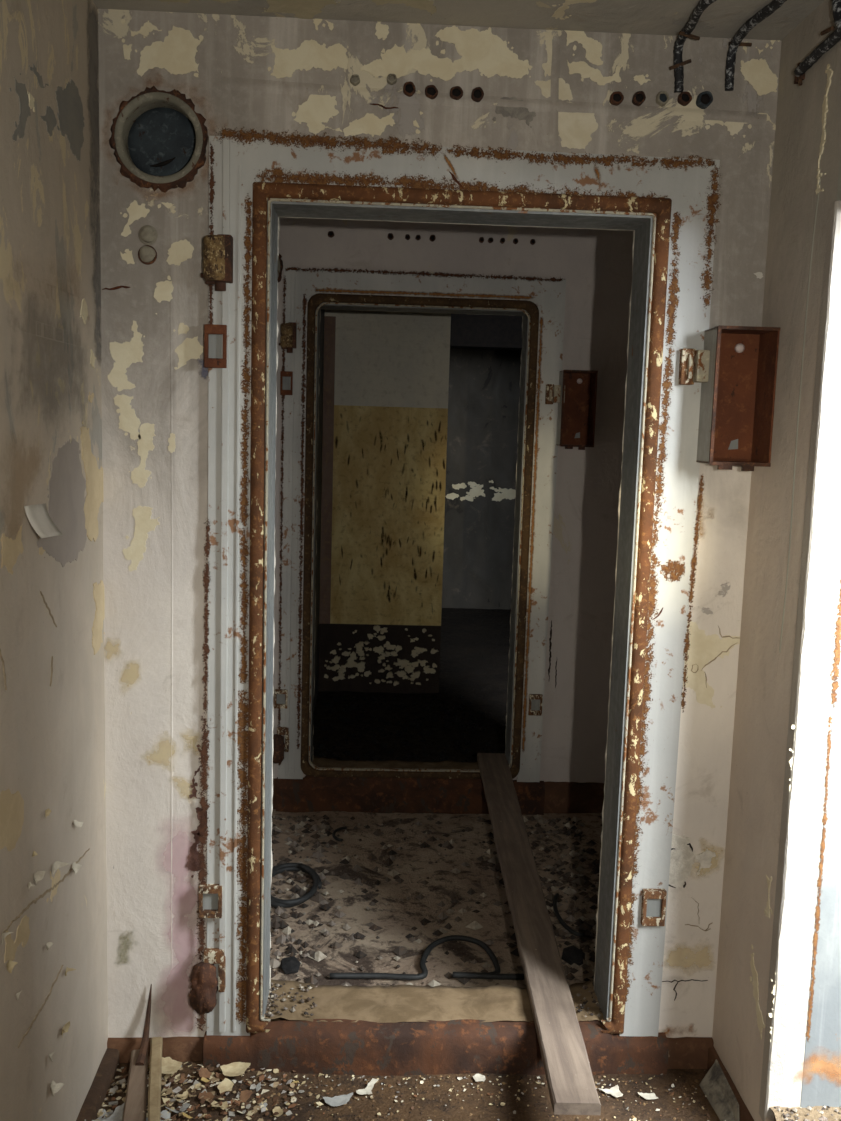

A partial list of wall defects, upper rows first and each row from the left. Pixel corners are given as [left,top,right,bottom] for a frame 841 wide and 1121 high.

peeling [121,19,204,77]
peeling [268,0,651,149]
peeling [740,40,780,96]
peeling [154,239,194,314]
peeling [107,321,176,488]
flaking render [0,421,104,574]
corrosion [209,127,721,1034]
corrosion [195,519,211,963]
corrosion [806,564,841,1042]
crack [669,882,712,931]
crack [662,979,708,1001]
corrosion [803,1055,841,1083]